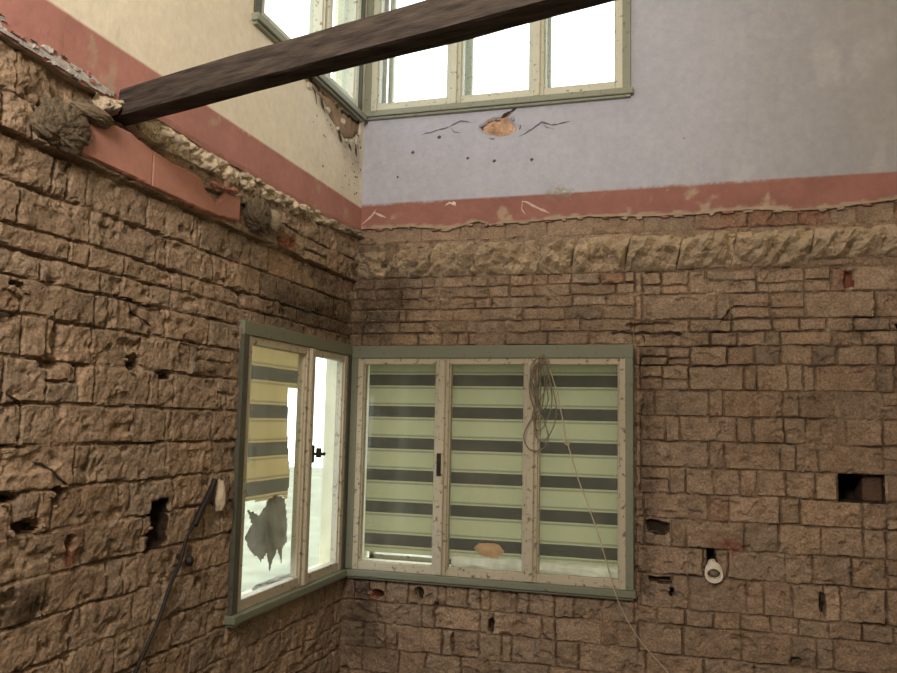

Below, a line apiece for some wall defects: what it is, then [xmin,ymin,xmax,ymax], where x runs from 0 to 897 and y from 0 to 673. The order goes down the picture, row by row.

flaking render [0,13,363,239]
crack [421,120,471,136]
flaking render [478,108,521,139]
crack [521,121,569,136]